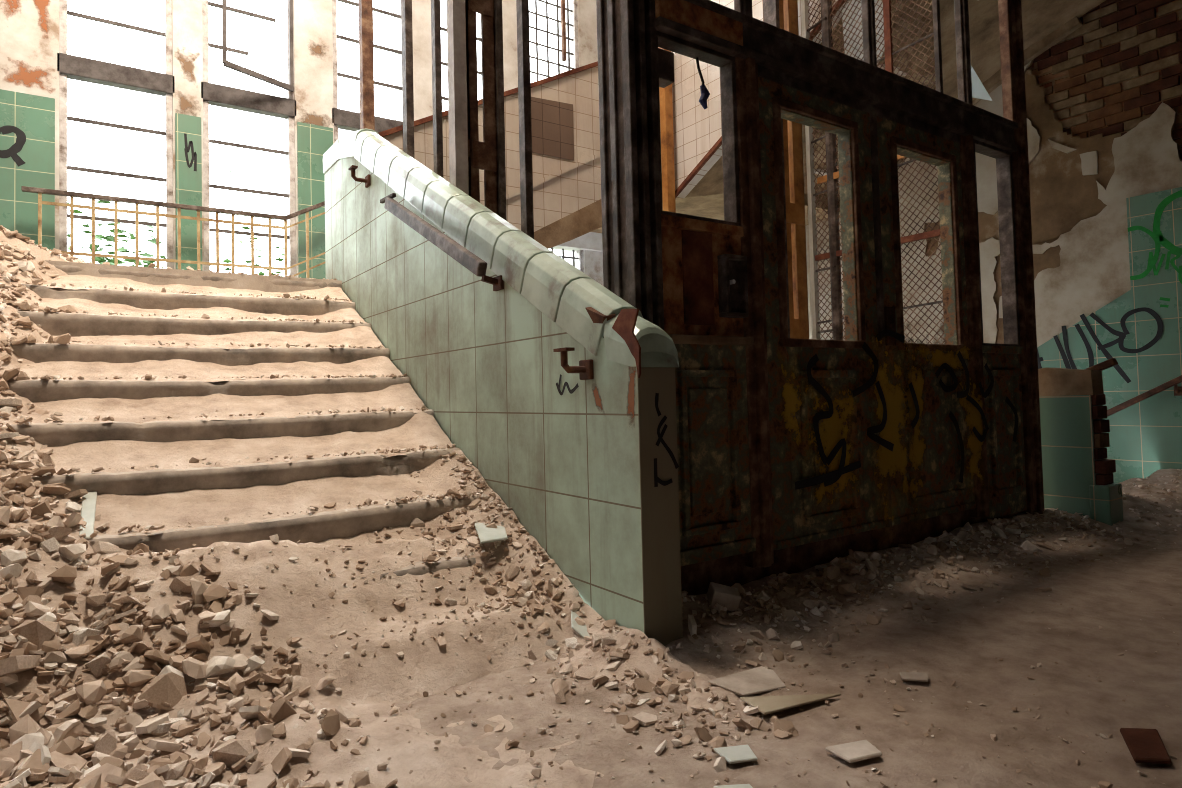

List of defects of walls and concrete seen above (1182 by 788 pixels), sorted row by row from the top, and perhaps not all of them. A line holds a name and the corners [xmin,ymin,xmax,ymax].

spalling [1025,0,1182,280]
peeling [978,212,999,243]
spalling [612,309,641,378]
peeling [994,255,1004,344]